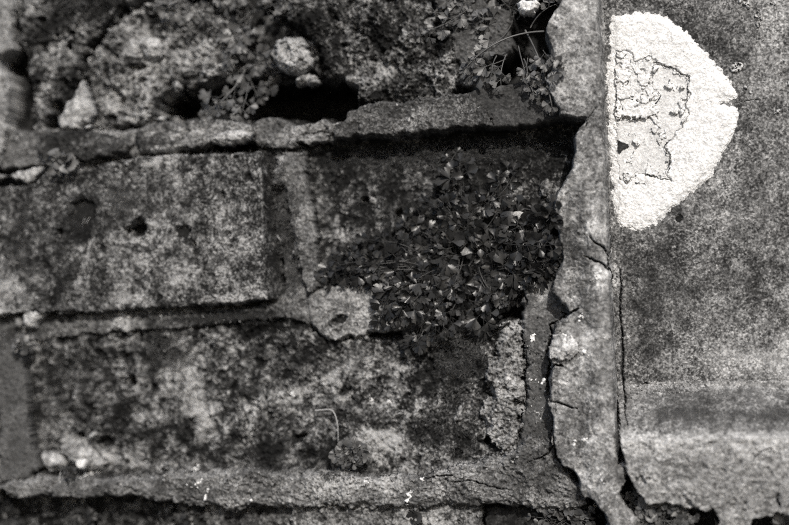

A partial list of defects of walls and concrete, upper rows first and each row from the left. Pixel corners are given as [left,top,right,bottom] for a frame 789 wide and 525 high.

peeling [605,11,740,231]
crack [527,308,579,469]
crack [585,236,628,424]